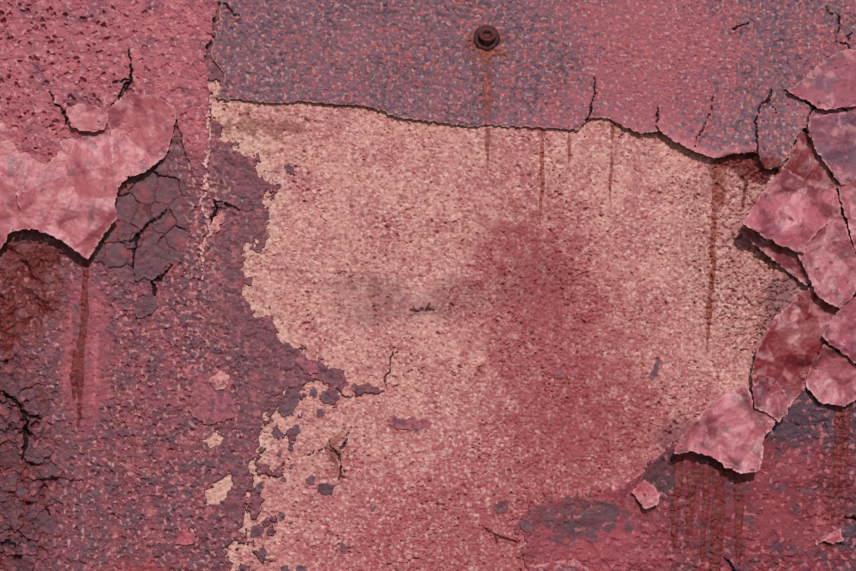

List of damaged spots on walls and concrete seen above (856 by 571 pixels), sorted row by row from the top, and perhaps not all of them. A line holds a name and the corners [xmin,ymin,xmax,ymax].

crack [826,6,853,48]
rust [466,25,507,162]
crack [585,77,597,121]
peeling [0,92,177,259]
crack [129,209,173,296]
peeling [133,243,170,281]
spalling [205,49,856,571]
peeling [188,370,233,448]
rust [671,455,744,571]